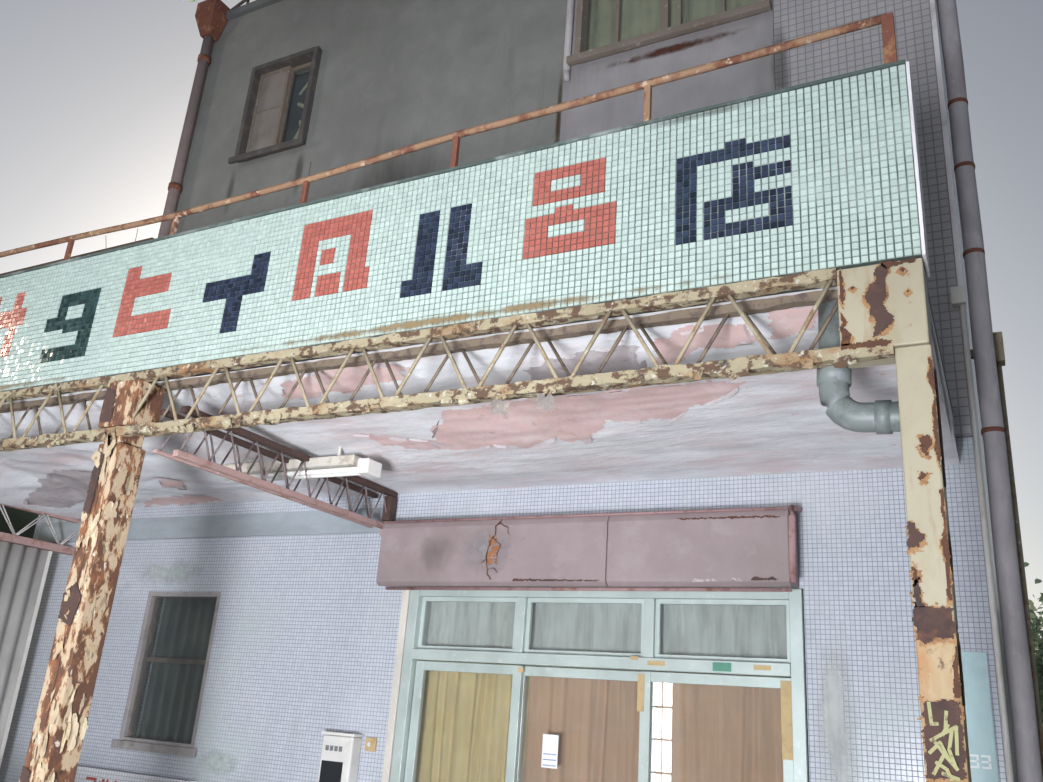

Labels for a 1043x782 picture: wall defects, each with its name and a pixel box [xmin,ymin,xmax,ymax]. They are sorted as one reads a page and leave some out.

corrosion [630,38,711,62]
corrosion [316,297,587,341]
corrosion [837,257,917,351]
peeling [353,305,818,450]
peeling [833,352,857,368]
corrosion [99,387,116,422]
peeling [147,421,206,434]
peeling [222,414,281,430]
corrosion [83,451,104,514]
crack [481,519,509,580]
corrosion [905,356,967,782]
corrosion [58,582,82,626]